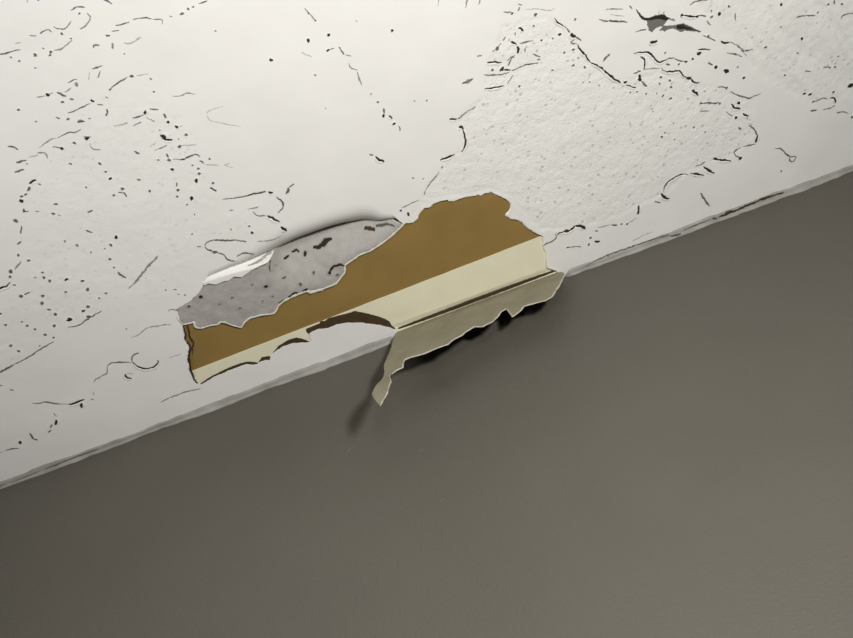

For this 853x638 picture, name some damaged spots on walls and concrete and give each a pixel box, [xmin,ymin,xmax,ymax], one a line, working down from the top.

flaking render [630,6,729,44]
crack [679,0,722,25]
flaking render [479,12,554,92]
crack [108,75,192,126]
crack [325,47,401,131]
crack [369,154,385,164]
crack [553,18,796,266]
crack [156,154,294,261]
flaking render [176,106,476,329]
crack [543,225,586,246]
crack [0,342,53,391]
crack [5,399,94,451]